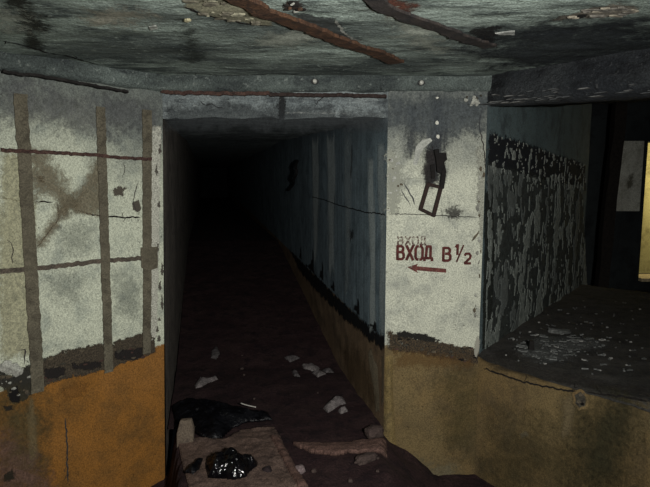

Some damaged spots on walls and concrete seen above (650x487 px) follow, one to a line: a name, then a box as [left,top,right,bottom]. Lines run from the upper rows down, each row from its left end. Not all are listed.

flaking render [182,0,273,26]
crack [313,197,477,218]
peeling [112,125,164,369]
peeling [476,133,613,375]
flaking render [291,253,478,364]
flaking render [0,343,104,411]
crack [483,368,647,402]